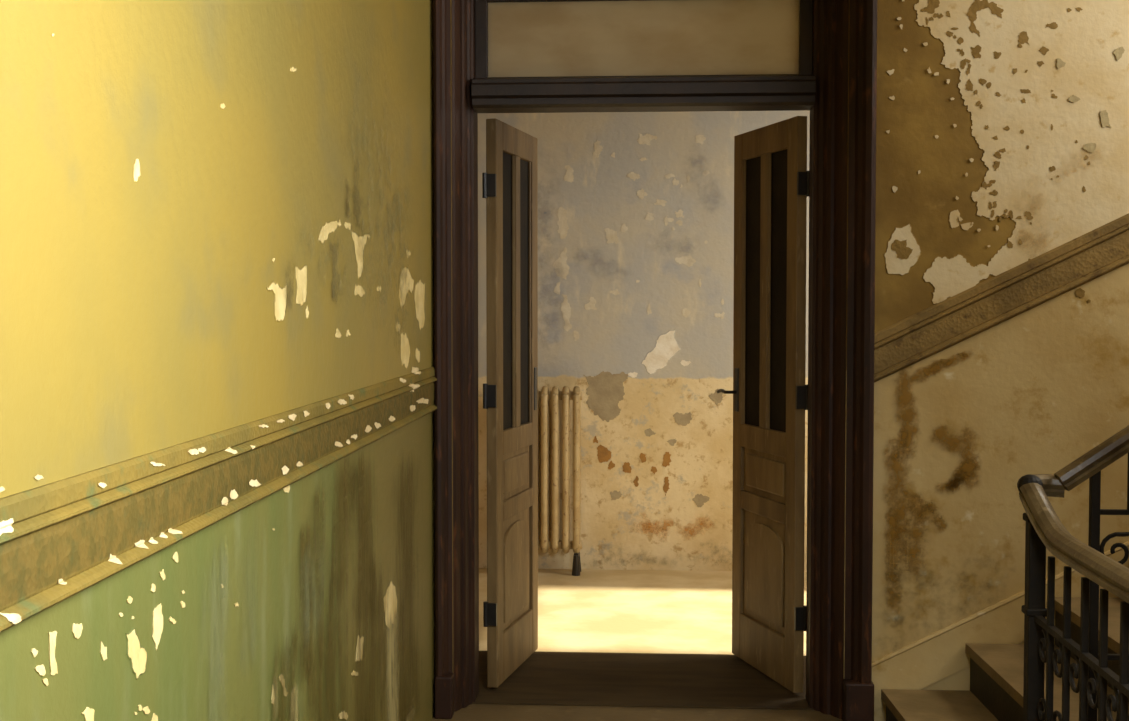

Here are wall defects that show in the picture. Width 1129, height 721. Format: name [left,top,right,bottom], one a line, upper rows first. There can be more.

peeling [883,0,1129,305]
peeling [319,219,381,297]
peeling [266,266,309,323]
flaking render [593,412,692,495]
peeling [221,489,238,506]
peeling [0,518,14,536]
peeling [134,528,183,549]
peeling [0,613,22,625]
peeling [118,569,185,680]
damp [339,462,417,721]
peeling [383,580,397,629]
peeling [31,631,58,686]